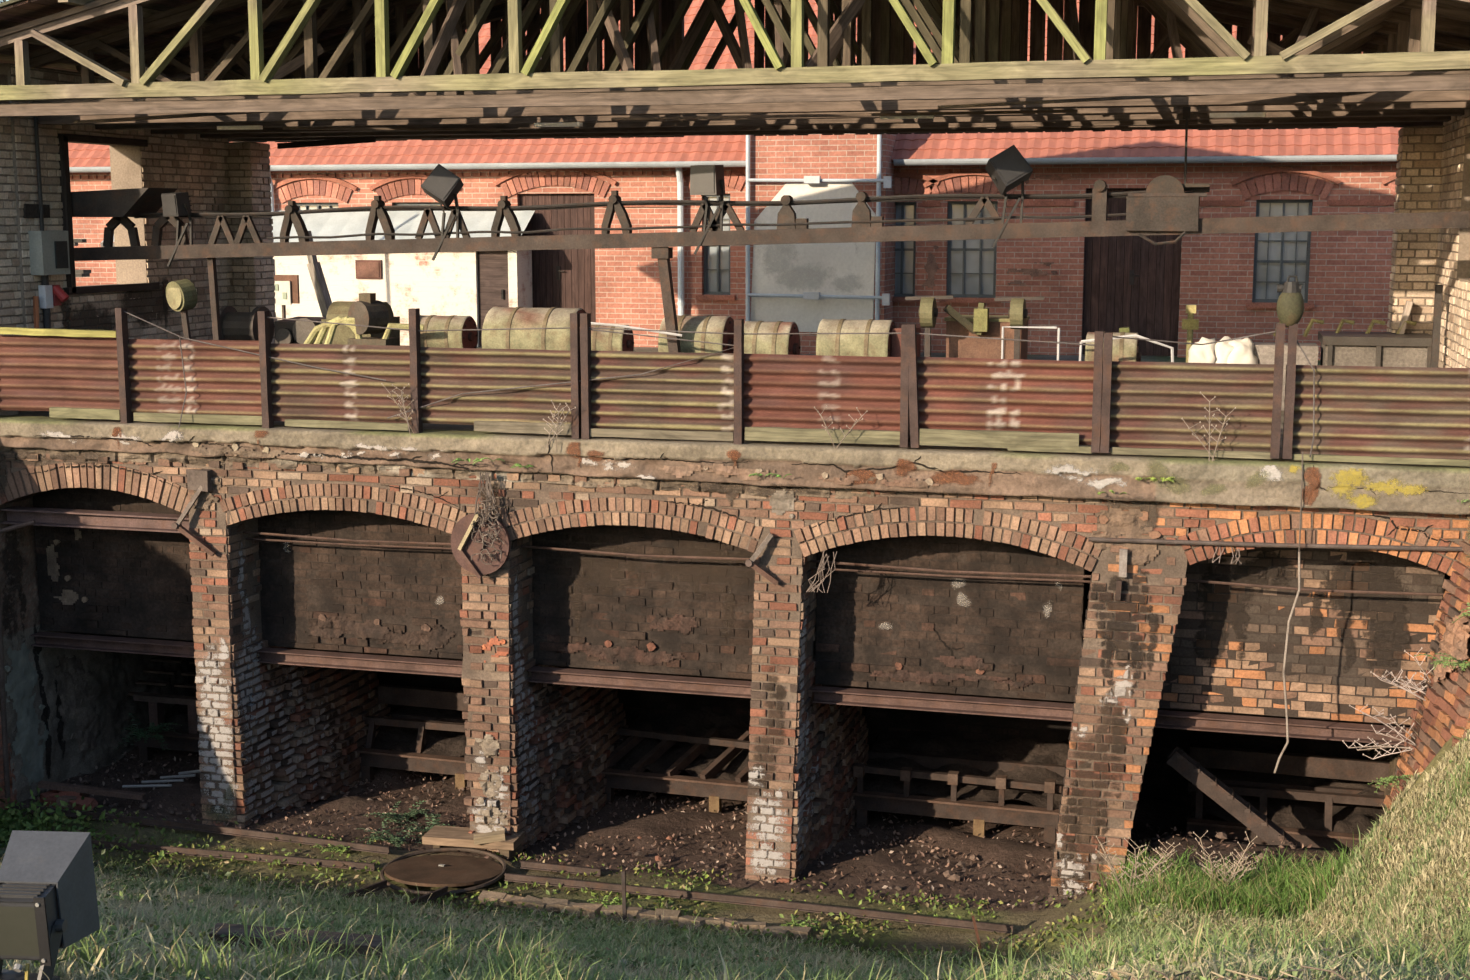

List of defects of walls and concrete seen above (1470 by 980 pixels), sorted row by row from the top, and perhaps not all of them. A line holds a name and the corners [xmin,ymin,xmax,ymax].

leakage [195,542,337,823]
leakage [471,570,596,840]
leakage [747,601,821,875]
leakage [1052,609,1159,899]